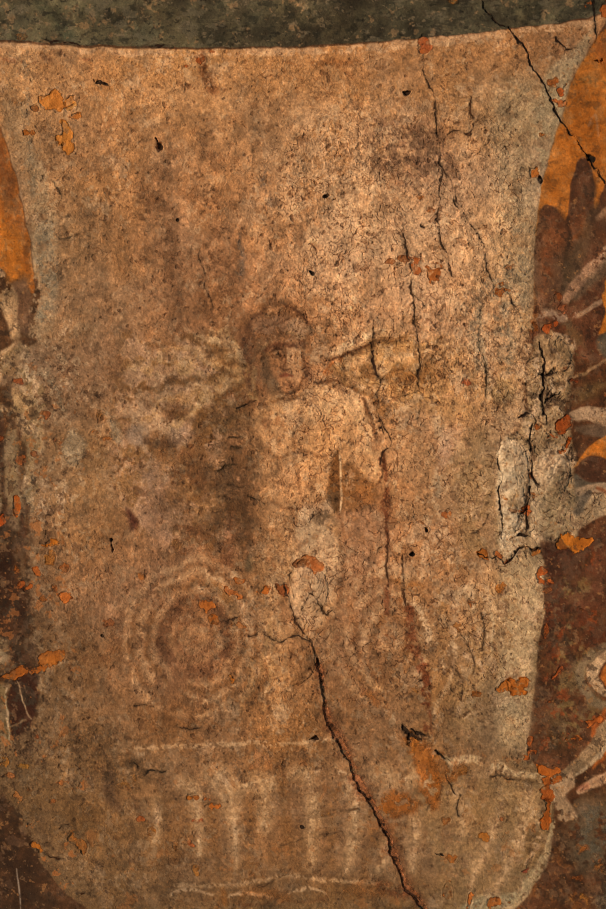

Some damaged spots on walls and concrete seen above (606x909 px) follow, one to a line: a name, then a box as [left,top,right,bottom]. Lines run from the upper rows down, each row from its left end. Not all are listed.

crack [483,7,606,184]
peeling [385,255,442,284]
crack [403,71,521,418]
crack [371,320,391,465]
crack [473,342,560,564]
peeling [292,555,324,575]
peeling [555,533,594,554]
peeling [1,649,65,680]
peeling [496,676,530,696]
crack [226,572,426,909]
crack [402,725,461,817]
peeling [524,736,562,830]